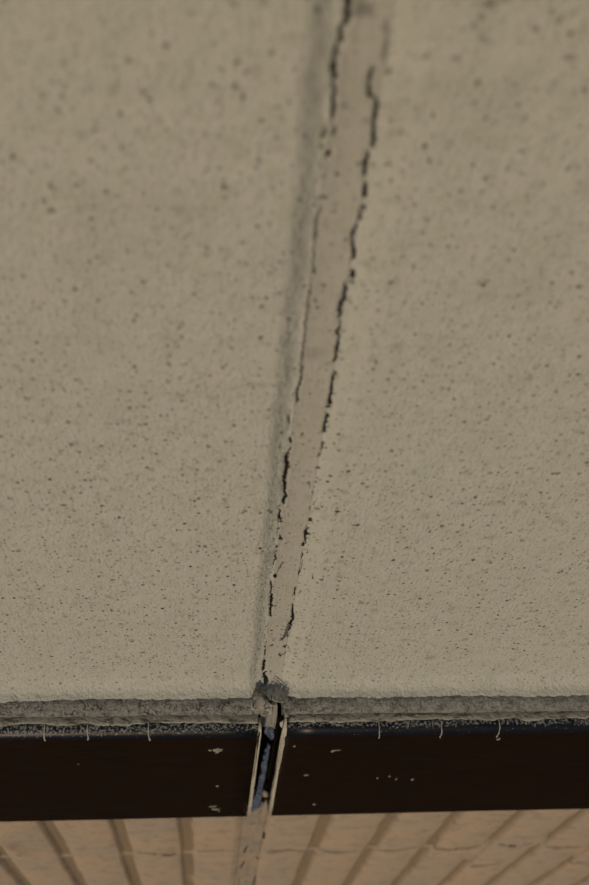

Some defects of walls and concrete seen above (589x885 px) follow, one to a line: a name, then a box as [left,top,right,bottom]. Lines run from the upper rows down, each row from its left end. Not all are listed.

crack [261,65,379,687]
crack [303,0,351,176]